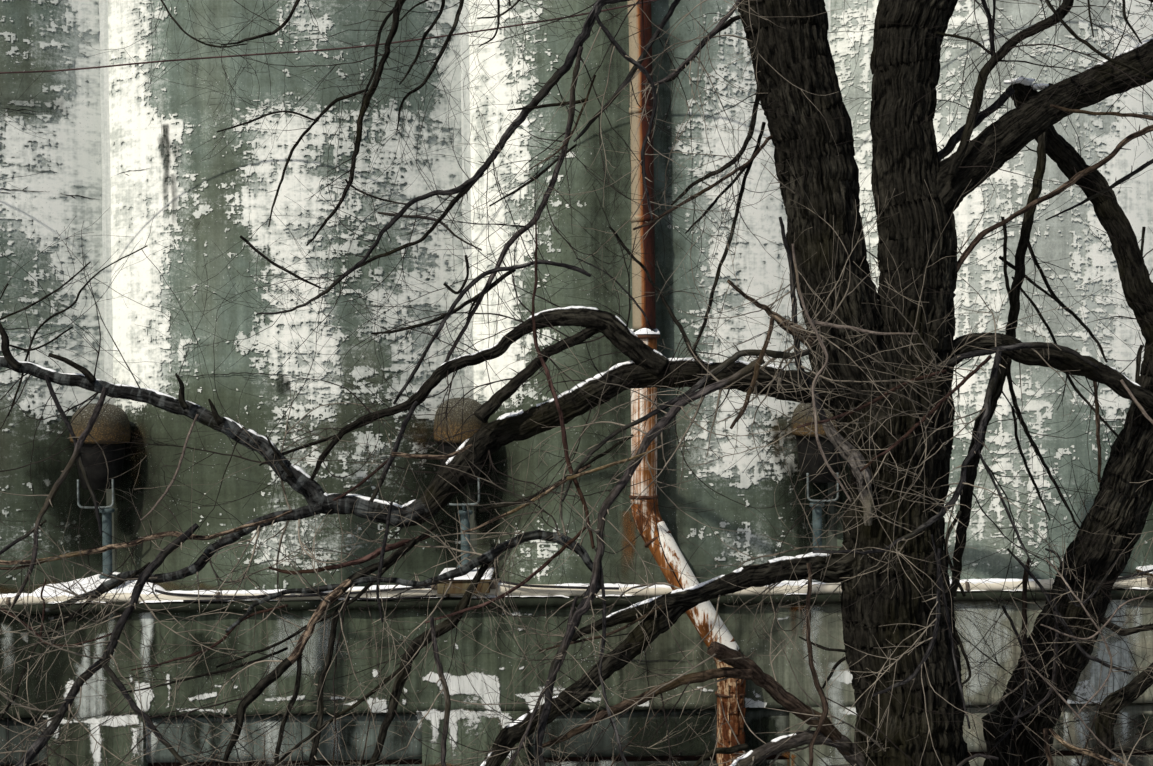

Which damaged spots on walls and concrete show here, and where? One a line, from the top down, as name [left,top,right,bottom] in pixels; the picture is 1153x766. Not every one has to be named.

peeling [0,0,587,499]
peeling [665,3,812,372]
peeling [829,0,880,293]
peeling [933,0,1153,161]
peeling [953,143,1145,382]
peeling [1058,80,1153,283]
peeling [238,514,362,589]
peeling [494,520,580,579]
peeling [679,389,800,507]
peeling [944,353,1130,568]
spalling [43,675,154,766]
spalling [416,667,512,756]